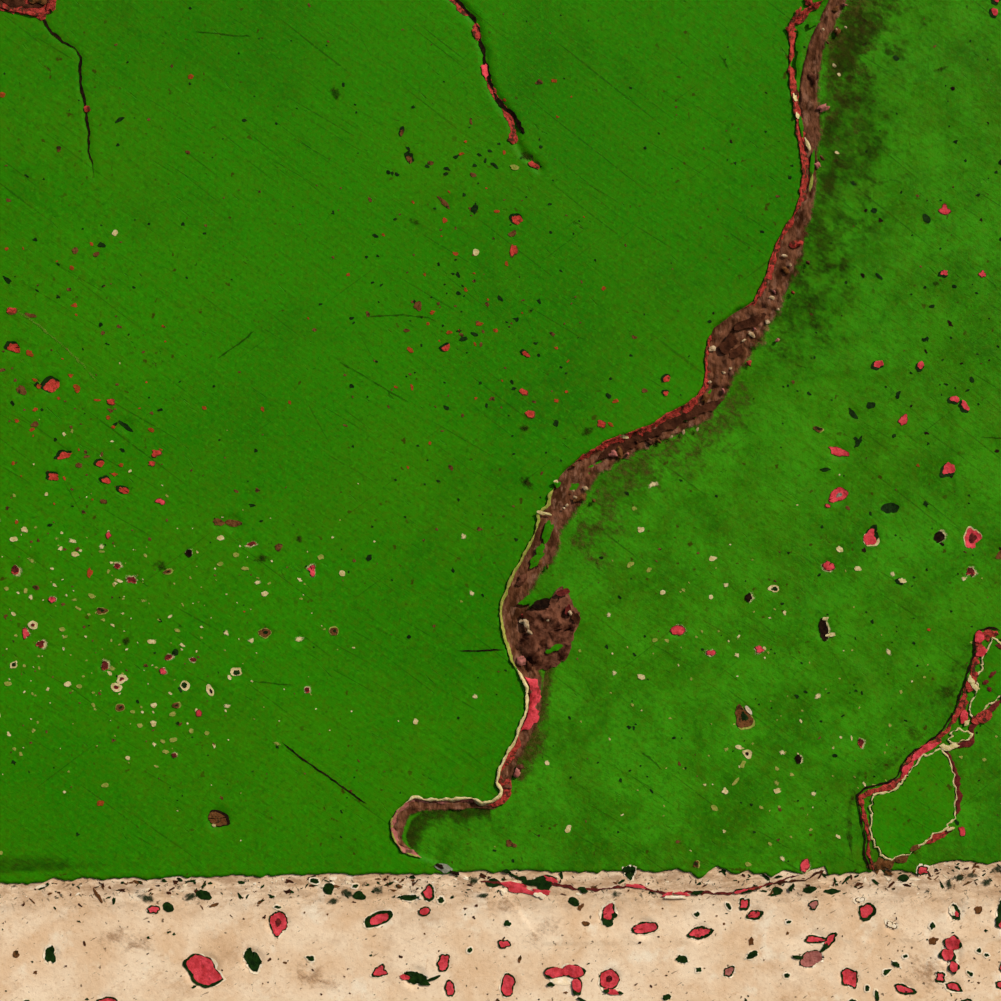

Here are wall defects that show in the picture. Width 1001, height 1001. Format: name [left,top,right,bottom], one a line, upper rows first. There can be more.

crack [43,19,94,172]
crack [390,0,848,858]